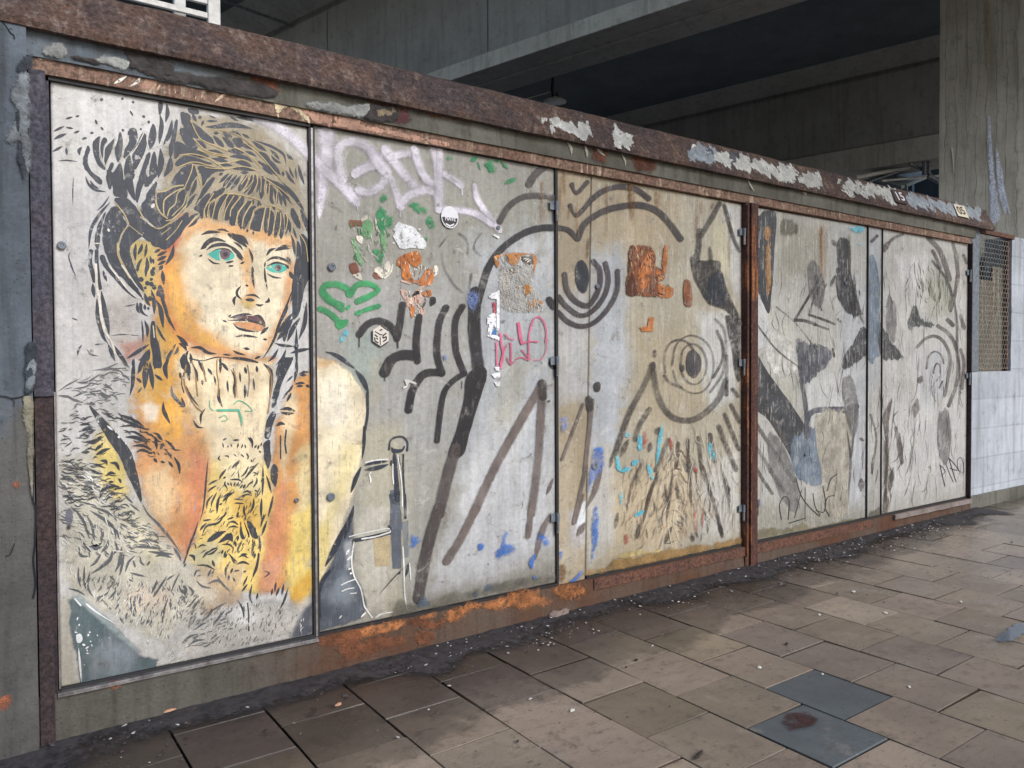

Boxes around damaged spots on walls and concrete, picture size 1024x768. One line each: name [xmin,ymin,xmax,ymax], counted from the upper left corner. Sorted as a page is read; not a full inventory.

spalling [6,43,450,179]
peeling [541,117,593,141]
rust [567,142,607,162]
peeling [612,123,634,151]
rust [621,154,656,173]
peeling [687,141,823,190]
peeling [837,178,982,222]
water stain [869,445,893,517]
water stain [585,537,742,574]
rust [321,565,585,658]